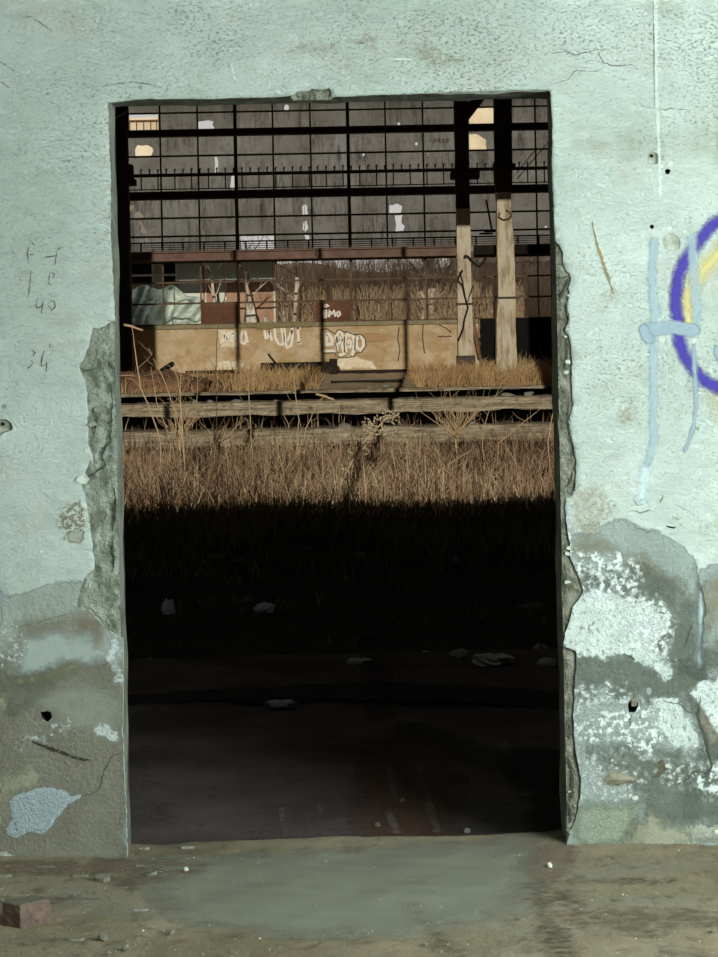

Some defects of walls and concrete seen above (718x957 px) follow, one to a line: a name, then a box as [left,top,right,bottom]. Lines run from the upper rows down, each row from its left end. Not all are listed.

crack [554,49,633,84]
flaking render [68,321,123,686]
water stain [0,582,559,858]
peeling [556,243,718,839]
crack [662,559,718,784]
flaking render [685,821,718,845]